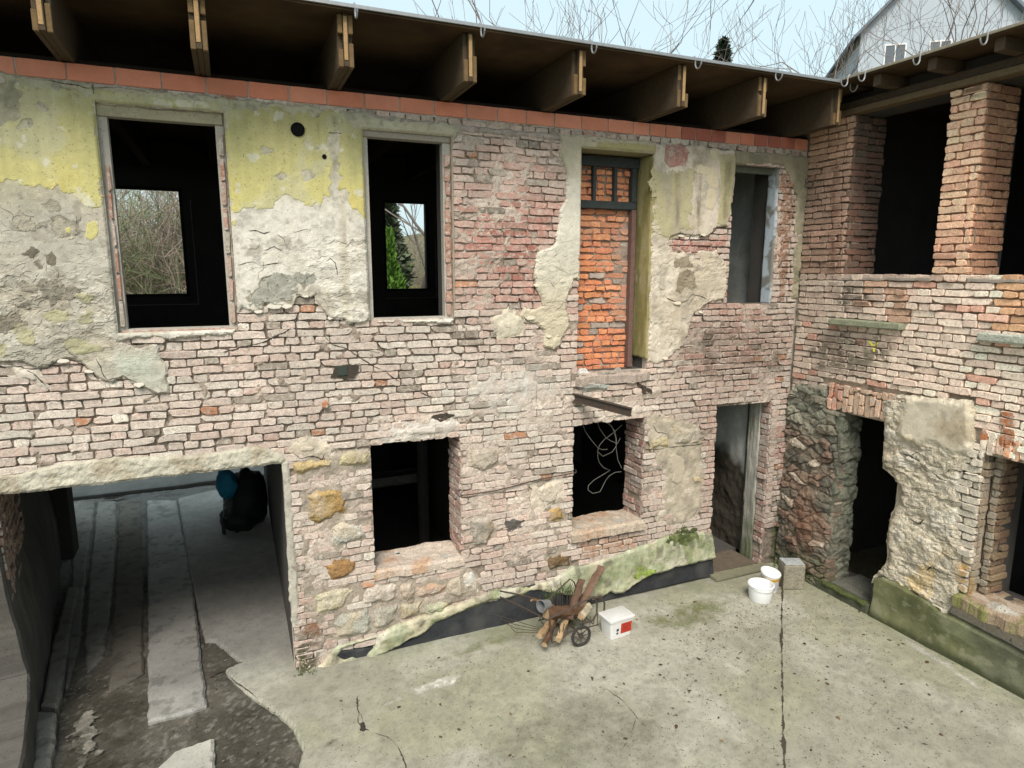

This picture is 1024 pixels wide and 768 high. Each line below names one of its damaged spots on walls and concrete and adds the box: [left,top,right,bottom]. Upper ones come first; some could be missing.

peeling [0,71,460,394]
crack [240,229,353,309]
peeling [489,133,809,364]
peeling [597,402,705,526]
peeling [883,393,1017,567]
crack [356,697,407,768]
crack [778,588,786,768]